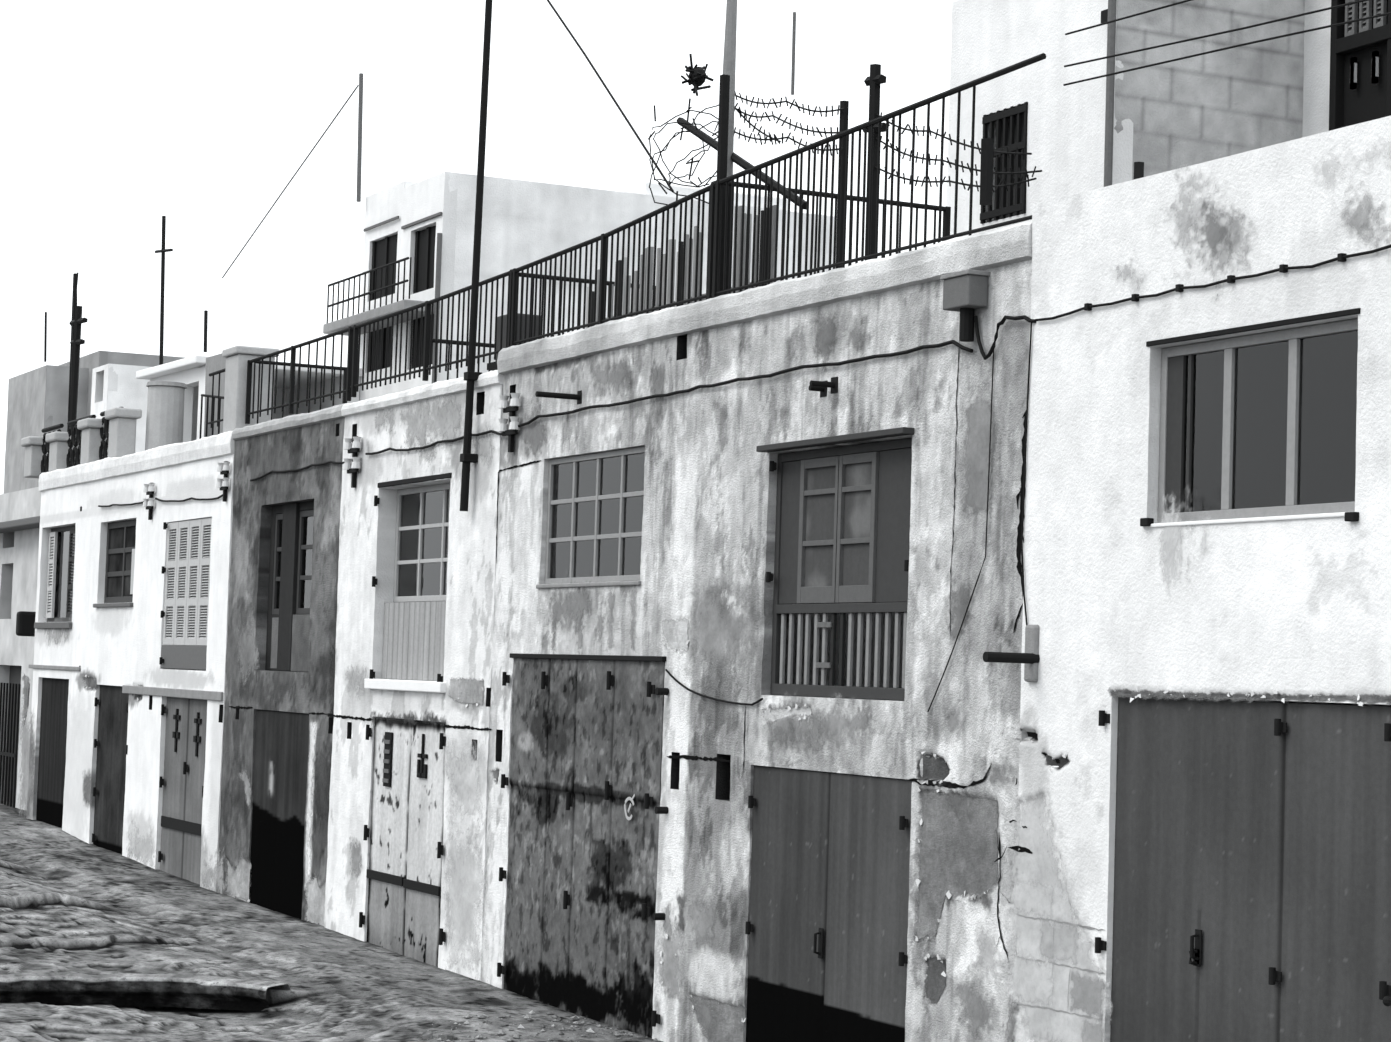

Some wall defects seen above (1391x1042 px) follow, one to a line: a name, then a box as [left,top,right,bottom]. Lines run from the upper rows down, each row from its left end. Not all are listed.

water stain [1170,174,1248,268]
water stain [1342,194,1391,247]
peeling [914,752,1110,1042]